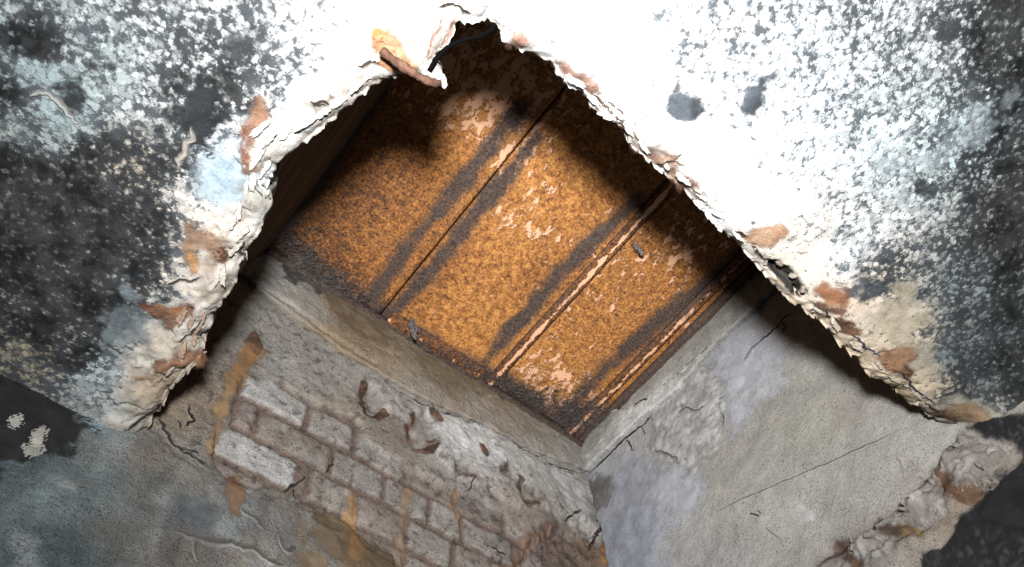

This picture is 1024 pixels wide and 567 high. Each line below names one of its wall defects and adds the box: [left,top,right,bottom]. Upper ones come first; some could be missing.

corrosion [371,27,418,73]
leakage [156,74,250,207]
corrosion [240,95,270,174]
peeling [565,73,651,154]
mould [742,70,779,115]
peeling [208,75,372,291]
mould [915,178,938,201]
spalling [763,257,806,297]
corrosion [813,283,860,336]
mould [844,270,884,302]
crack [128,403,211,469]
crack [716,298,958,567]